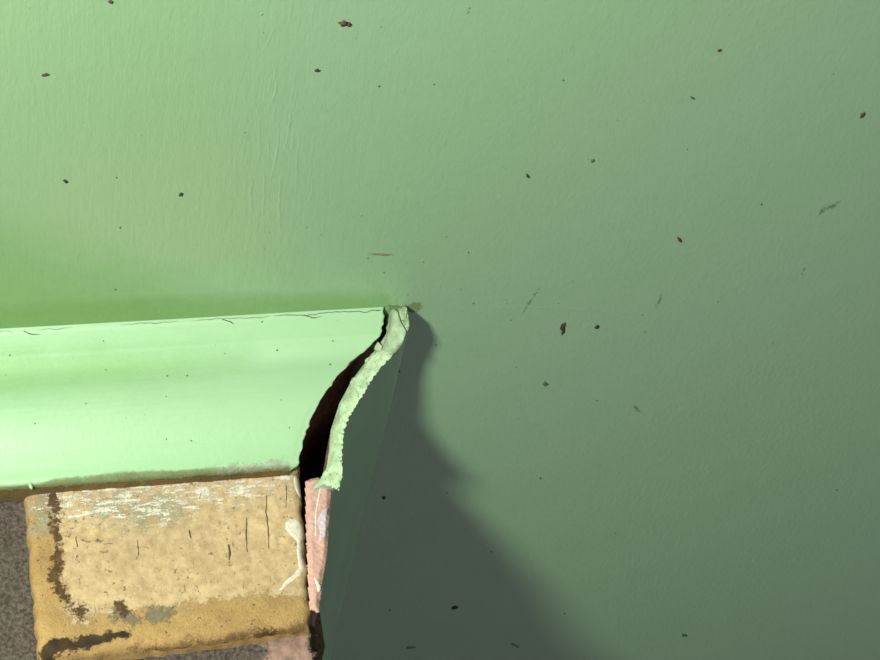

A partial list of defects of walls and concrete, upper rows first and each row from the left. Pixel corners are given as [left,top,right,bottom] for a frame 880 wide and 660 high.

water stain [46,492,89,622]